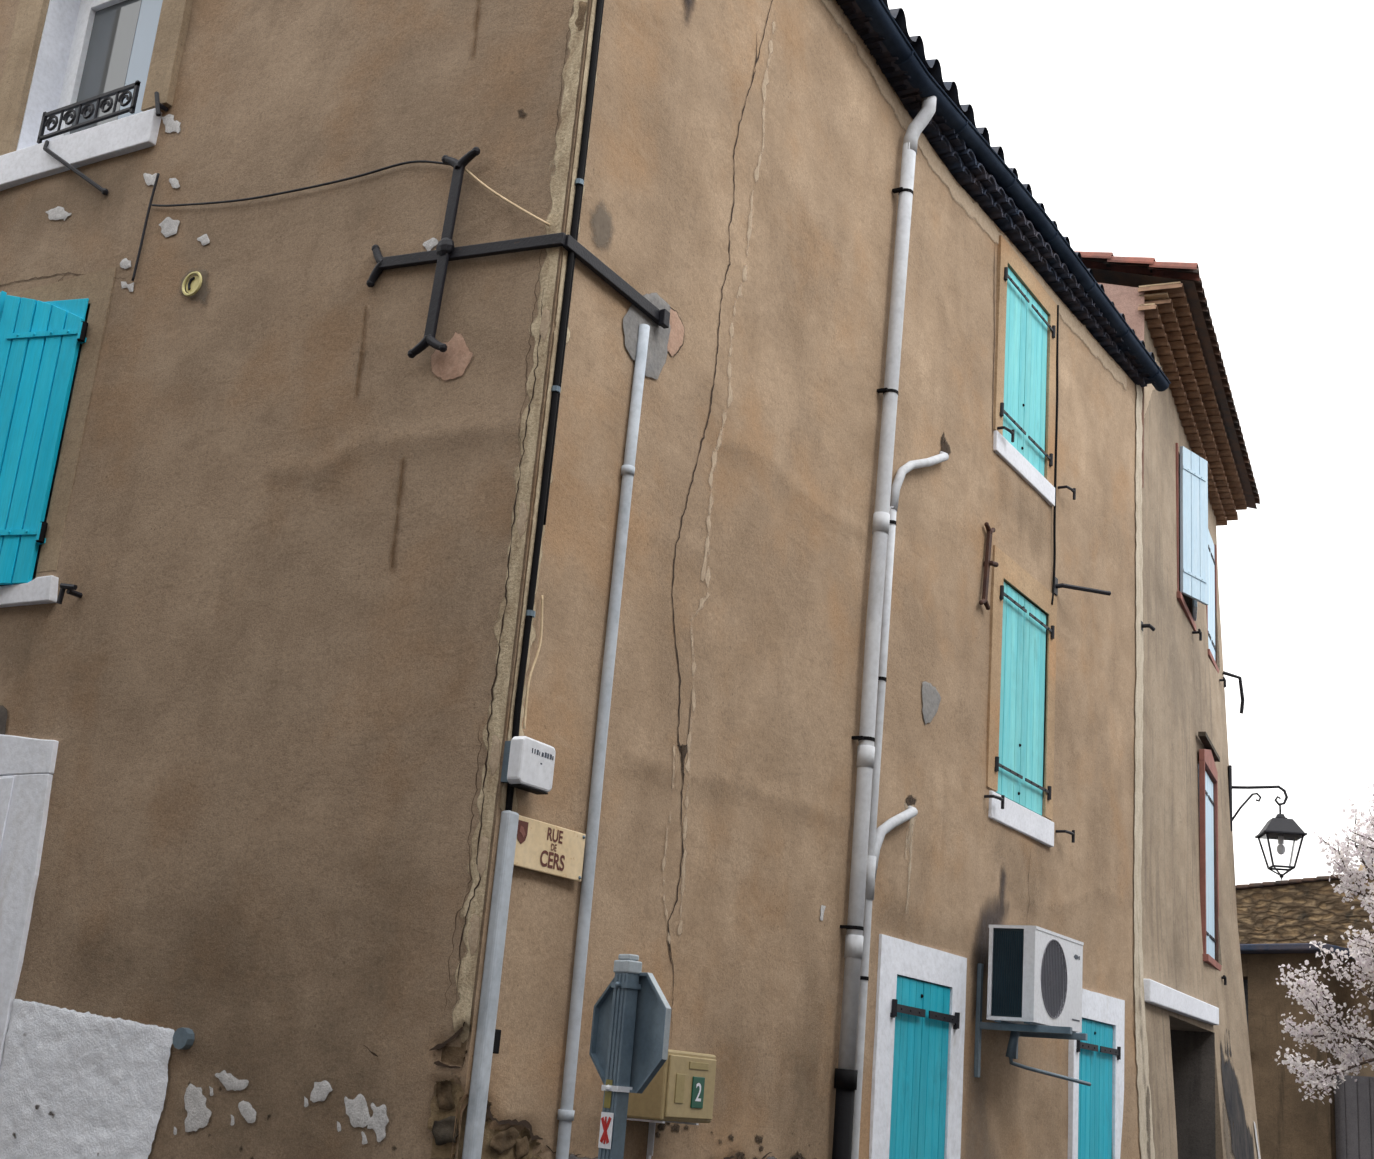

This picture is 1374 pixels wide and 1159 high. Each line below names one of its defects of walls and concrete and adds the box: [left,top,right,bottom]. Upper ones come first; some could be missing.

spalling [423,238,438,251]
crack [662,0,775,1035]
peeling [427,0,603,1159]
peeling [173,1070,270,1137]
peeling [304,1080,396,1150]
spalling [711,1132,816,1159]